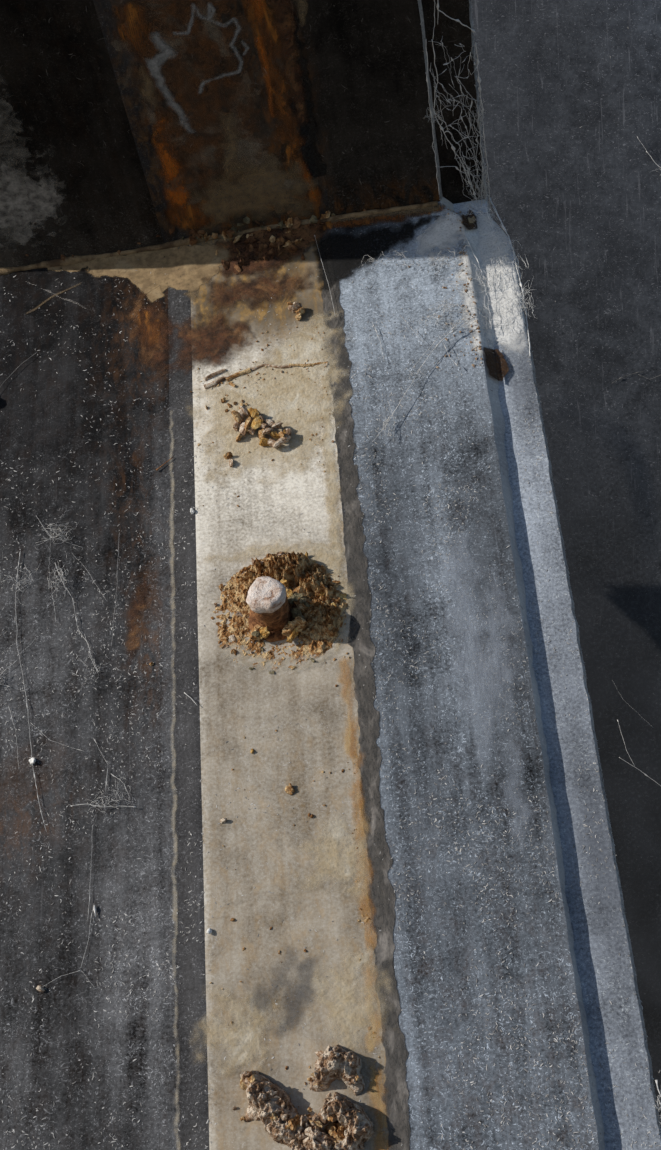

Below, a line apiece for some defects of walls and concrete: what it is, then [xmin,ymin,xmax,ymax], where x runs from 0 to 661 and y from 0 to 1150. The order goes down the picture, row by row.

damp [0,77,67,253]
peeling [47,239,230,302]
corrosion [129,0,445,376]